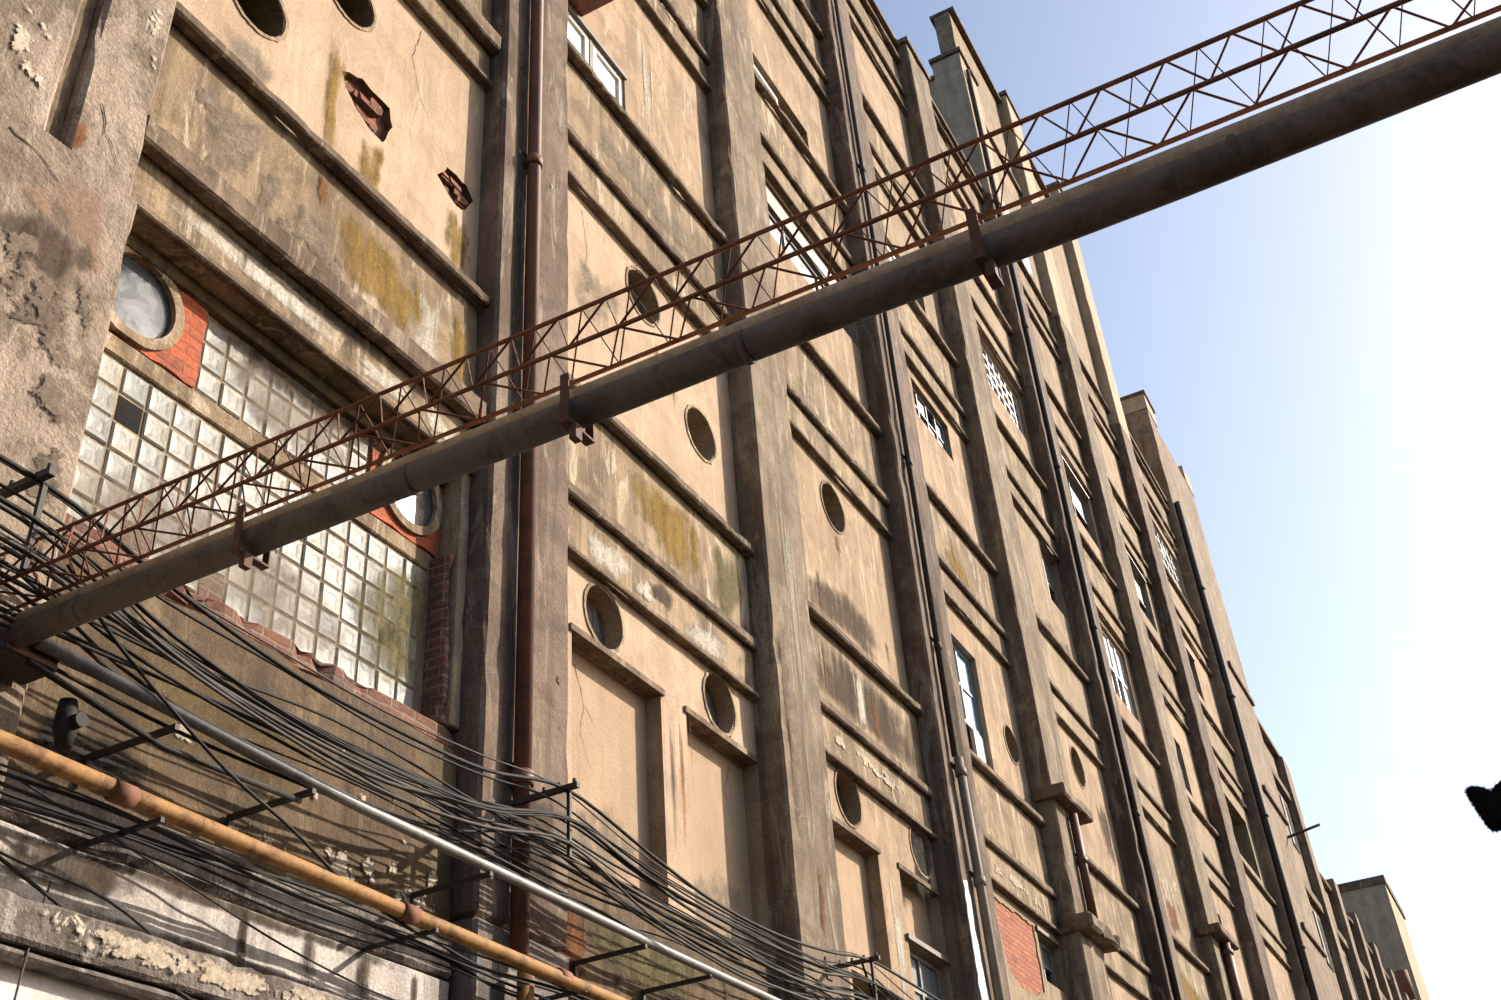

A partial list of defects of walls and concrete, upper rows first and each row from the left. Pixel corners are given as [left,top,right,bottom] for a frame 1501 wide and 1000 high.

leakage [326,53,345,142]
flaking render [344,78,385,139]
flaking render [437,171,468,210]
leakage [635,475,699,572]
leakage [355,571,425,677]
leakage [652,585,672,608]
leakage [716,550,739,617]
peeling [326,844,437,909]
flaking render [995,864,1043,909]
peeling [43,910,325,1000]
flaking render [994,898,1044,996]